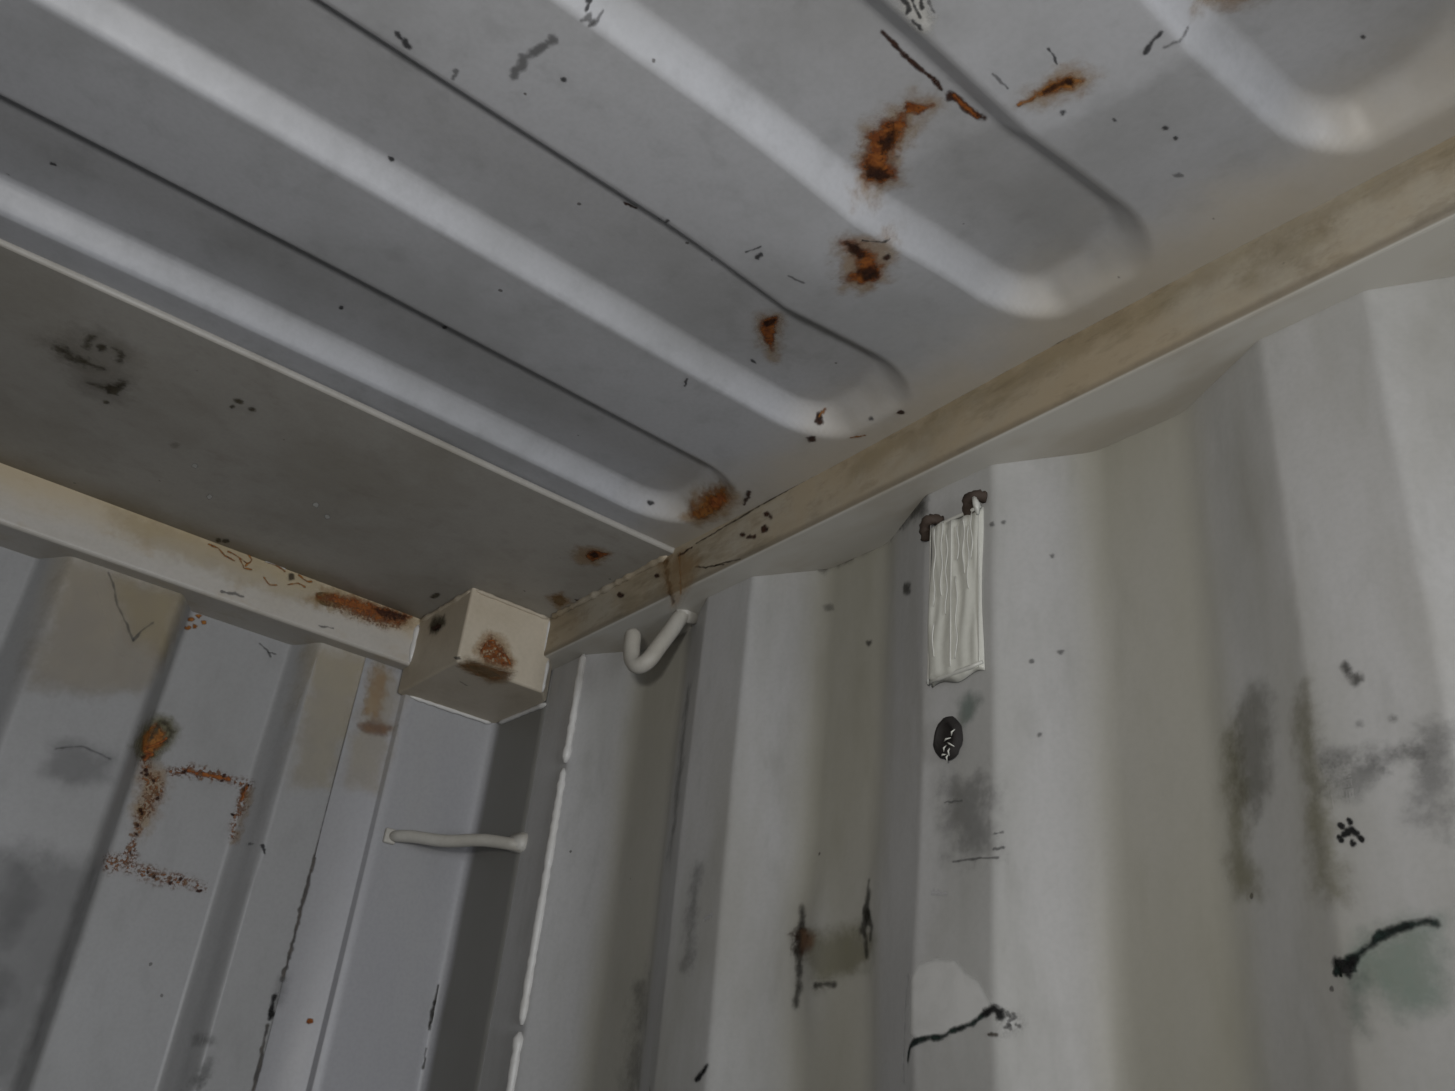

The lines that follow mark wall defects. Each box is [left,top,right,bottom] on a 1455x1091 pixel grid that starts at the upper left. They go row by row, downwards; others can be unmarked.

corrosion [859,30,986,184]
corrosion [1017,76,1084,106]
corrosion [843,240,890,284]
corrosion [760,316,778,350]
corrosion [654,487,793,604]
corrosion [317,594,412,627]
corrosion [462,637,511,681]
corrosion [104,749,251,893]
crack [1333,919,1439,977]
crack [907,1004,1005,1062]